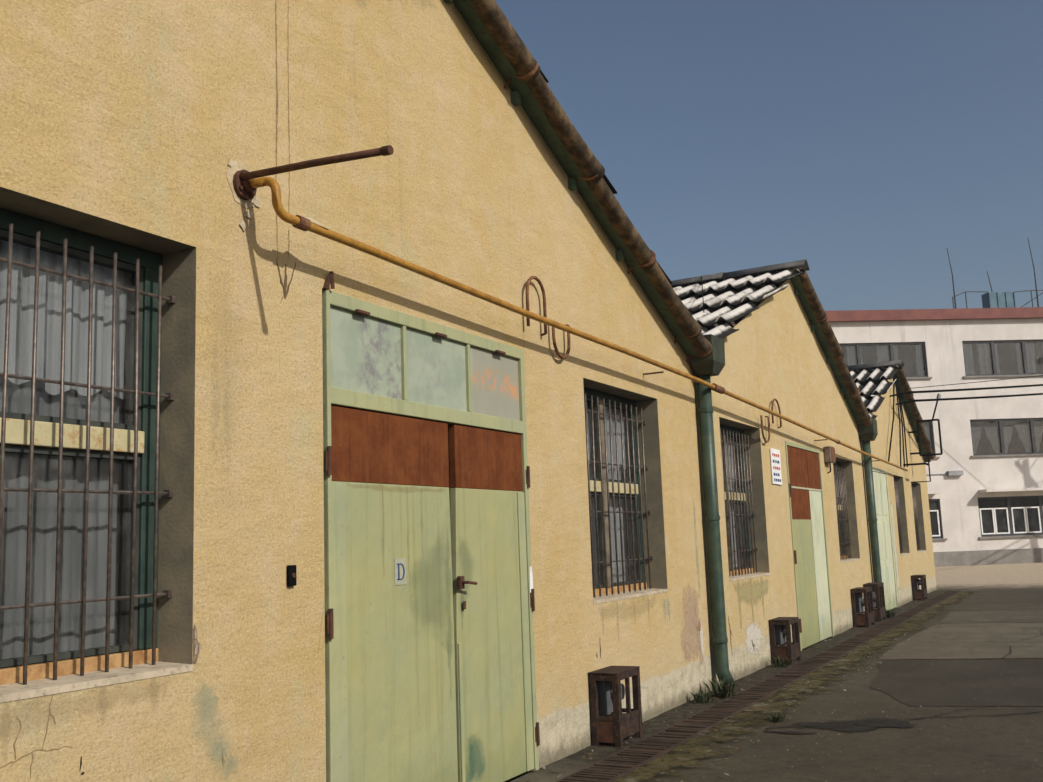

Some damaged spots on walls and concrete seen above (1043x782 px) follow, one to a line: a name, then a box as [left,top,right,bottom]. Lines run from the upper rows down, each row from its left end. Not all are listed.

flaking render [226,158,261,232]
peeling [682,589,703,663]
crack [0,694,85,775]